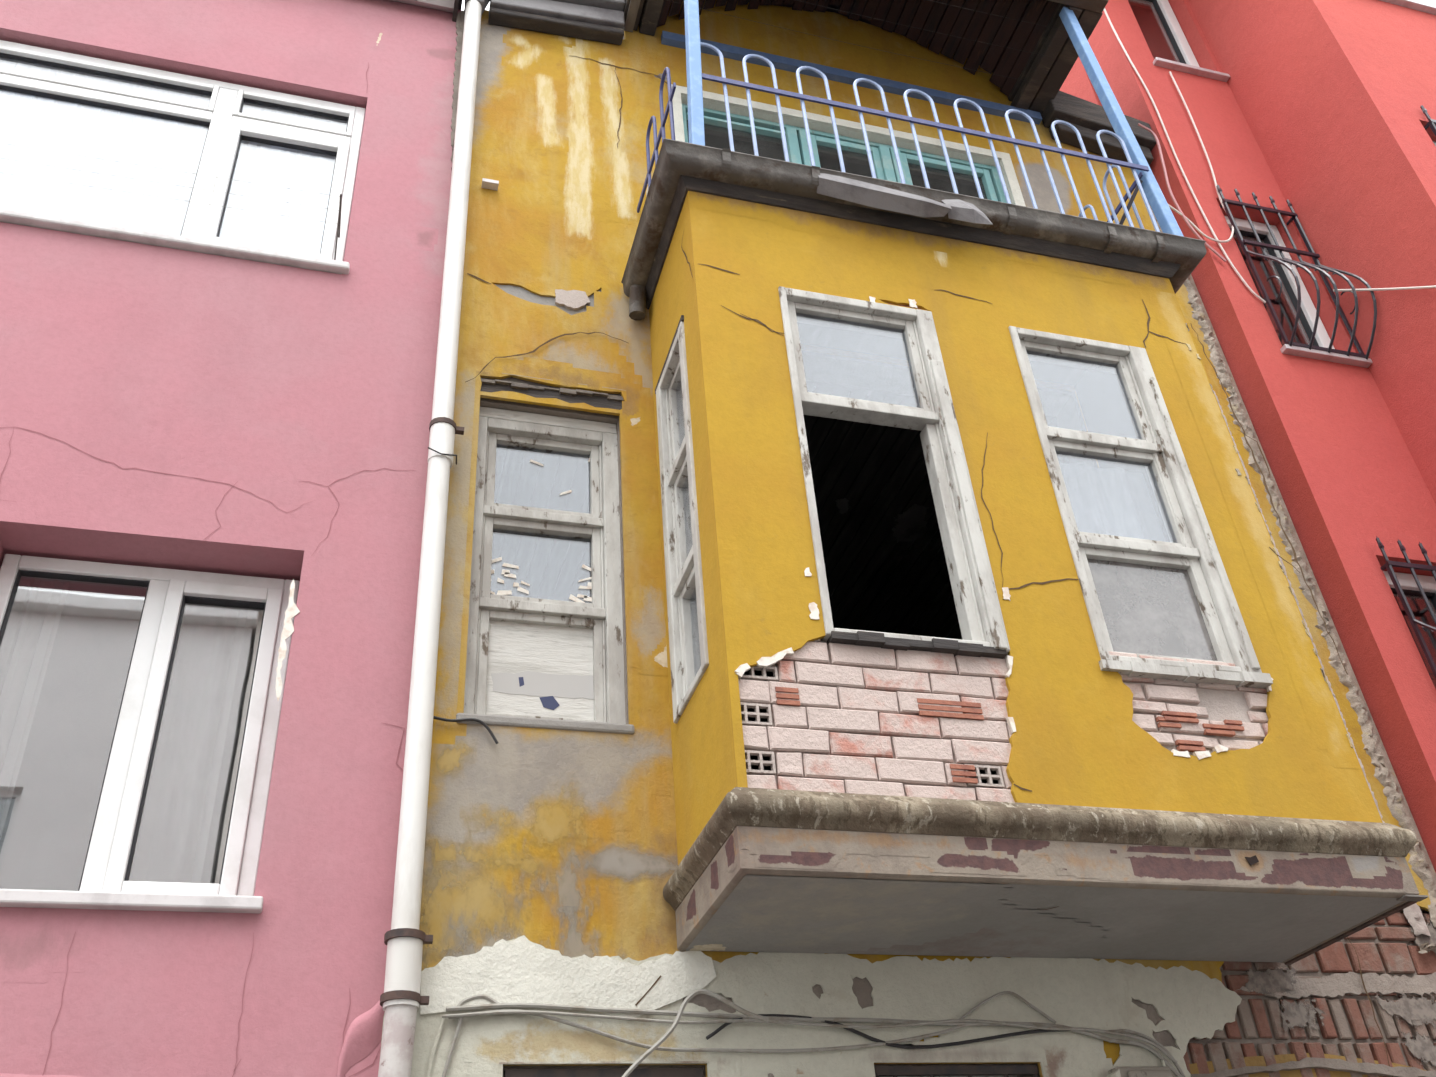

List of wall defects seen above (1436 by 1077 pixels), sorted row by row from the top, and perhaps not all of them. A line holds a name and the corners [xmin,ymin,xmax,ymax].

crack [466,332,628,382]
crack [0,427,406,555]
crack [981,433,1078,590]
peeling [809,602,819,620]
flaking render [734,639,1016,802]
flaking render [1093,274,1436,1077]
peeling [685,831,737,929]
peeling [754,848,849,870]
peeling [928,837,1076,876]
crack [42,932,76,1076]
crack [232,935,254,1077]
crack [343,988,381,1077]